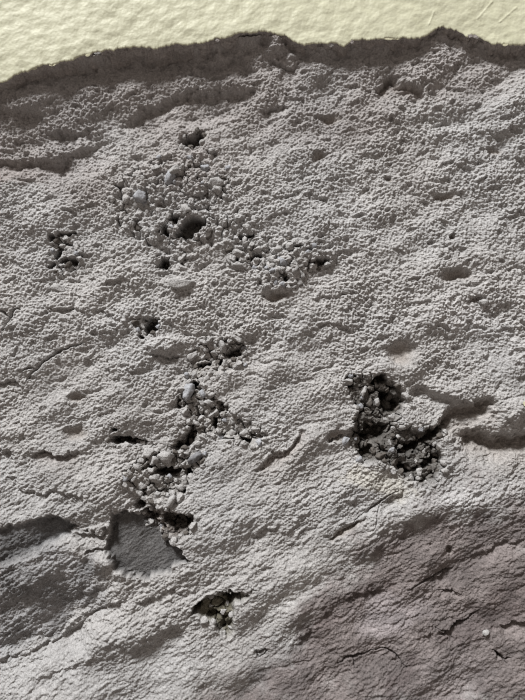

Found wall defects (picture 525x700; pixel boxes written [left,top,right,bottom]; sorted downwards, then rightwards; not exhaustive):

spalling [100,31,273,70]
spalling [278,27,525,59]
spalling [0,55,88,93]
spalling [375,79,423,104]
spalling [319,115,343,127]
spalling [160,213,208,243]
spalling [109,427,144,447]
spalling [169,424,198,450]
spalling [395,427,440,457]
spalling [140,461,194,479]
spalling [396,451,445,475]
peeling [102,507,196,584]